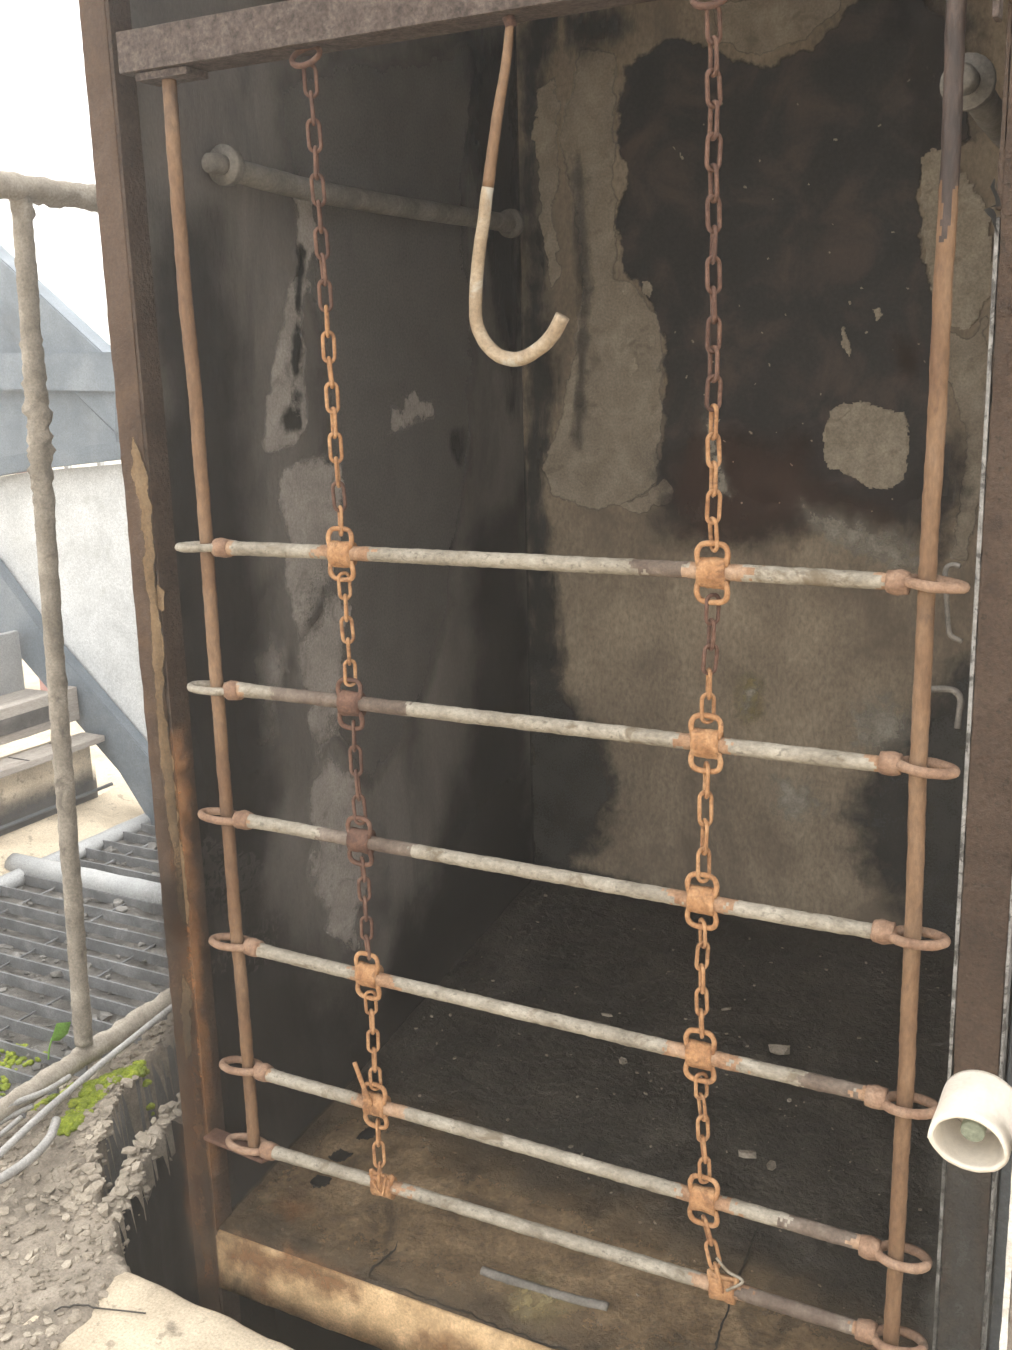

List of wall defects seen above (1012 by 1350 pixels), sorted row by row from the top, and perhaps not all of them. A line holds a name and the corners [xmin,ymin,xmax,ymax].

peeling [961,111,971,144]
peeling [263,198,317,452]
peeling [531,0,946,540]
flaking render [938,168,993,561]
peeling [278,458,345,638]
water stain [801,504,917,568]
water stain [843,772,909,916]
water stain [855,697,912,756]
water stain [921,659,970,948]